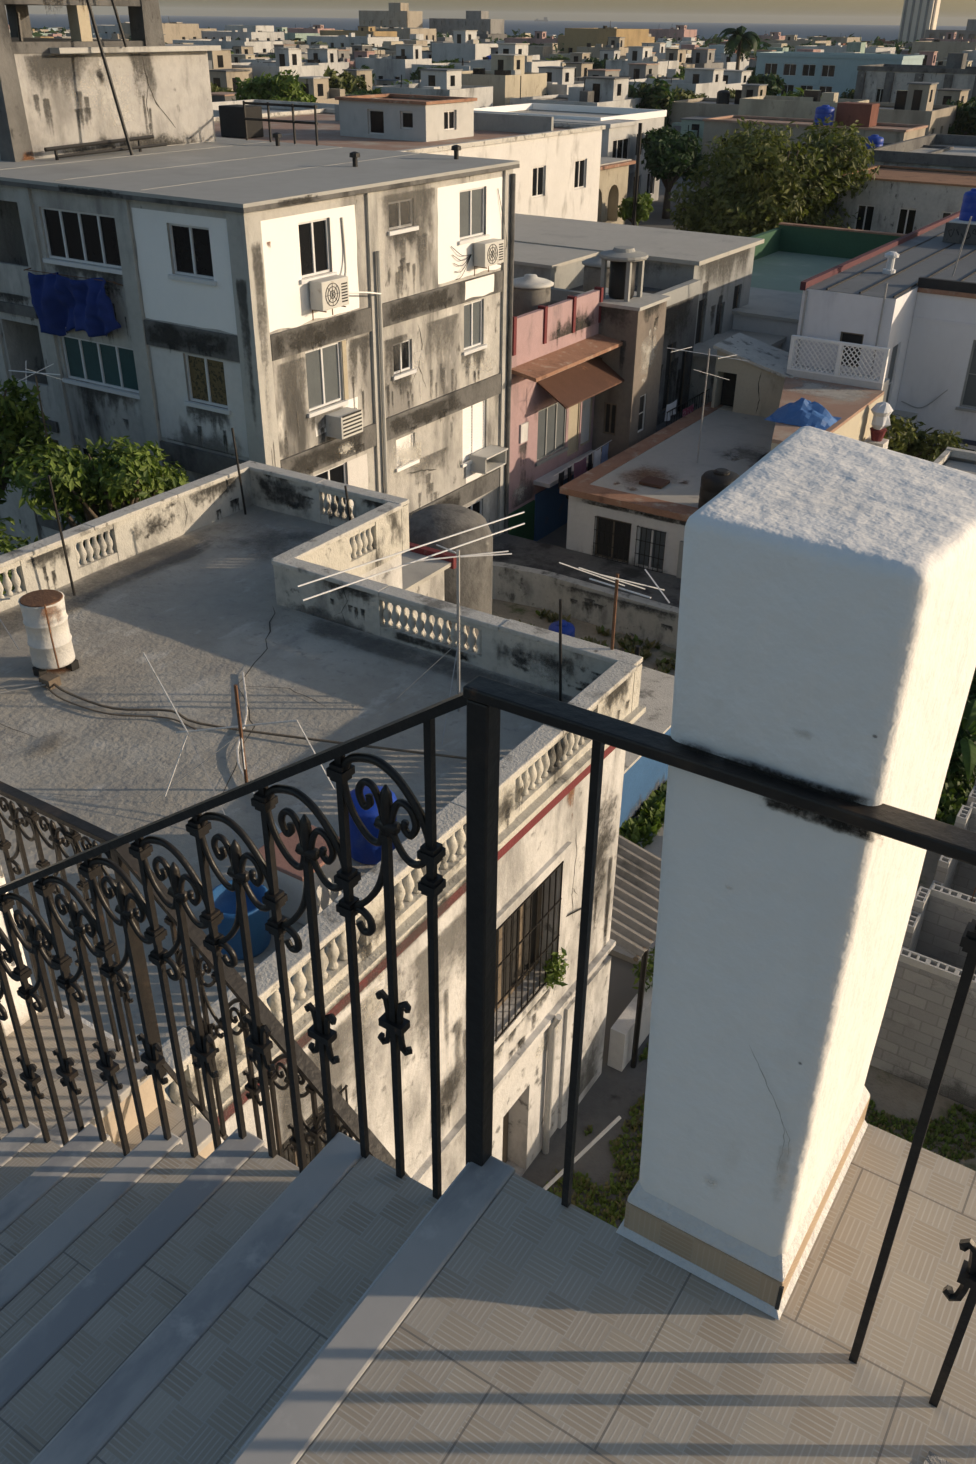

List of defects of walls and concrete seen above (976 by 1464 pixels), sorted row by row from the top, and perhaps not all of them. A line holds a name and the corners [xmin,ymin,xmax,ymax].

damp [27,55,104,127]
damp [64,53,196,154]
damp [0,292,34,320]
damp [55,265,126,335]
damp [149,325,226,356]
damp [236,188,485,509]
damp [80,387,133,426]
damp [174,406,235,456]
damp [328,502,353,520]
crack [223,608,326,792]
damp [498,787,523,825]